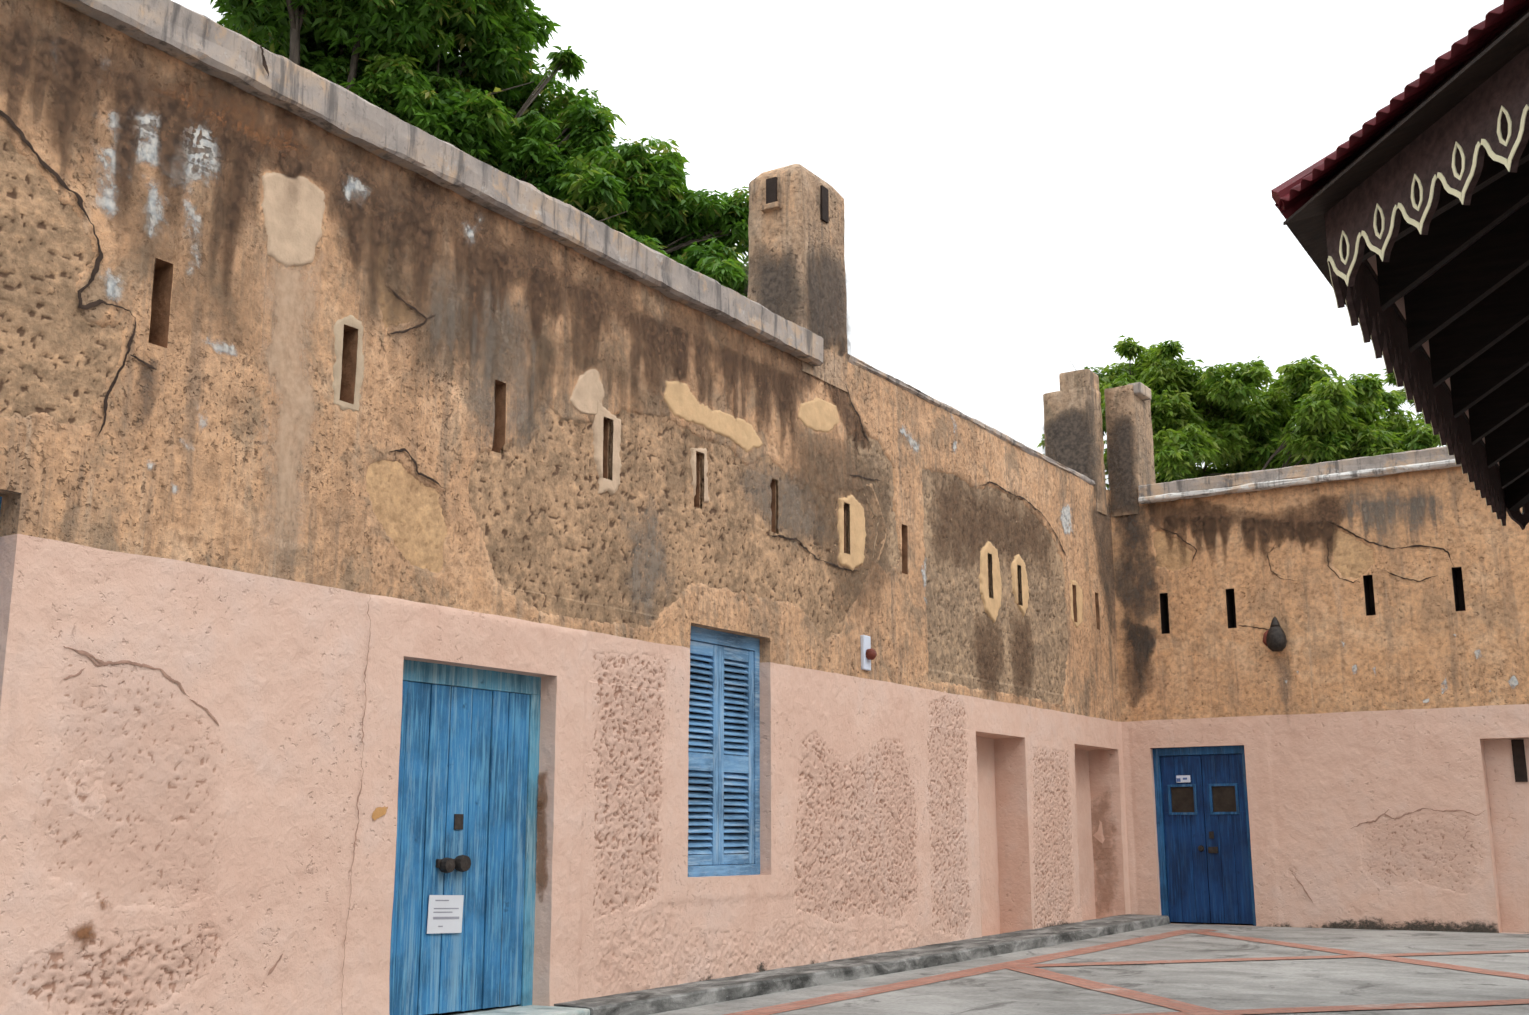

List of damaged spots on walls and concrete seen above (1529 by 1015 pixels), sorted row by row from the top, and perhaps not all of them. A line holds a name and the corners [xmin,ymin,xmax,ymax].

crack [0,110,156,437]
crack [386,286,435,334]
water stain [0,0,887,607]
crack [389,448,444,488]
water stain [937,483,1046,559]
water stain [1043,407,1433,700]
crack [64,646,219,725]
water stain [976,624,1030,694]